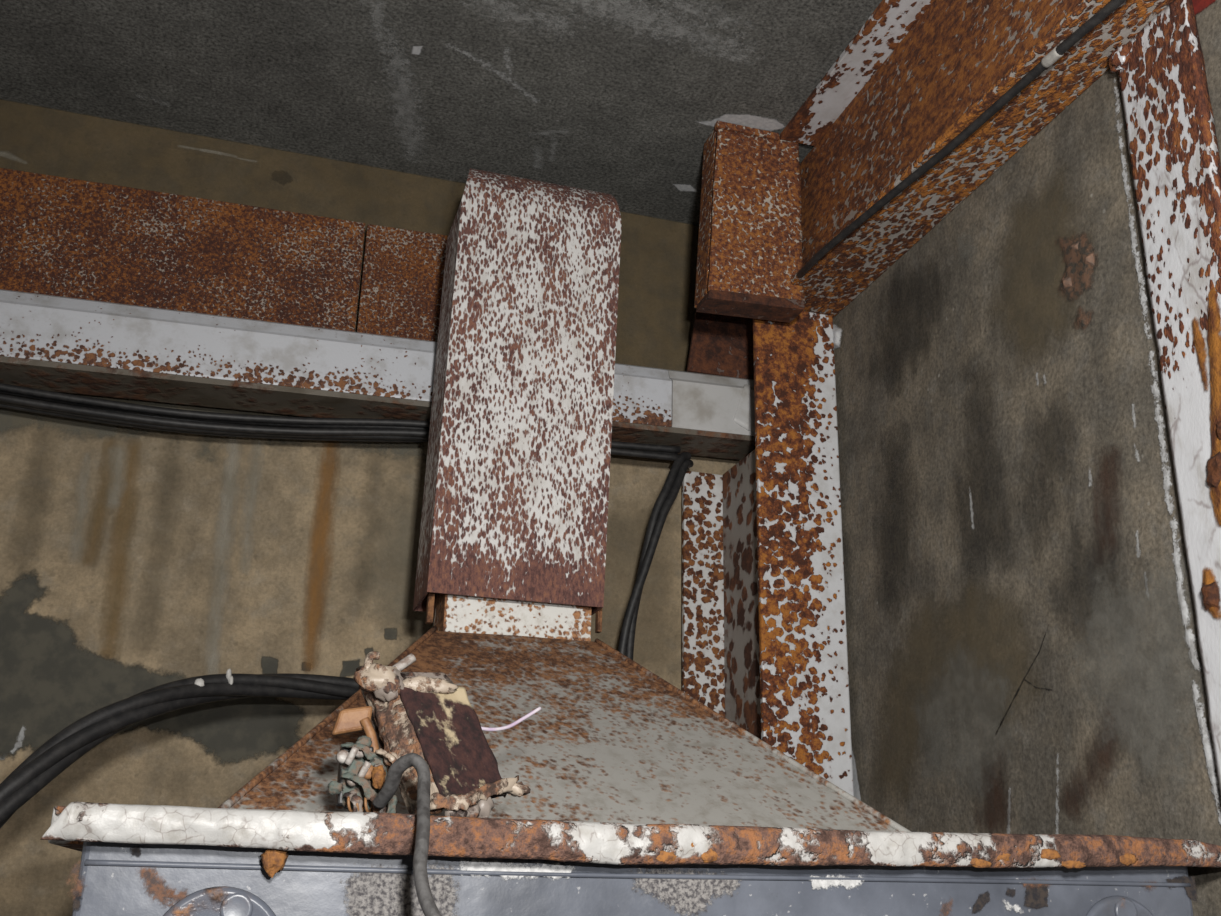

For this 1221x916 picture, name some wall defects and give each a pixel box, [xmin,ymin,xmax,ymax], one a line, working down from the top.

rust [1192,287,1221,526]
peeling [1114,79,1221,824]
rust [1201,568,1221,618]
leakage [0,572,185,759]
leakage [261,656,278,674]
leakage [877,589,1026,788]
leakage [118,696,305,764]
rust [656,850,677,863]
rust [691,843,718,863]
rust [970,853,1011,868]
rust [1040,848,1086,869]
rust [1119,854,1138,865]